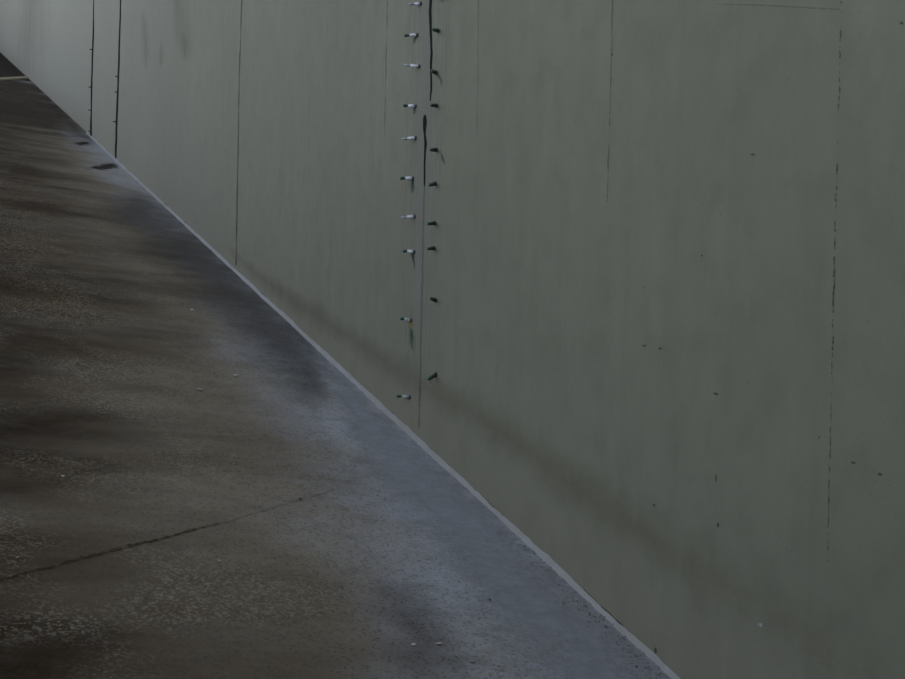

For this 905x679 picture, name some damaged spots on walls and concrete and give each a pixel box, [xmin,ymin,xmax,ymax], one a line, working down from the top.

crack [423,0,433,186]
crack [0,523,219,581]